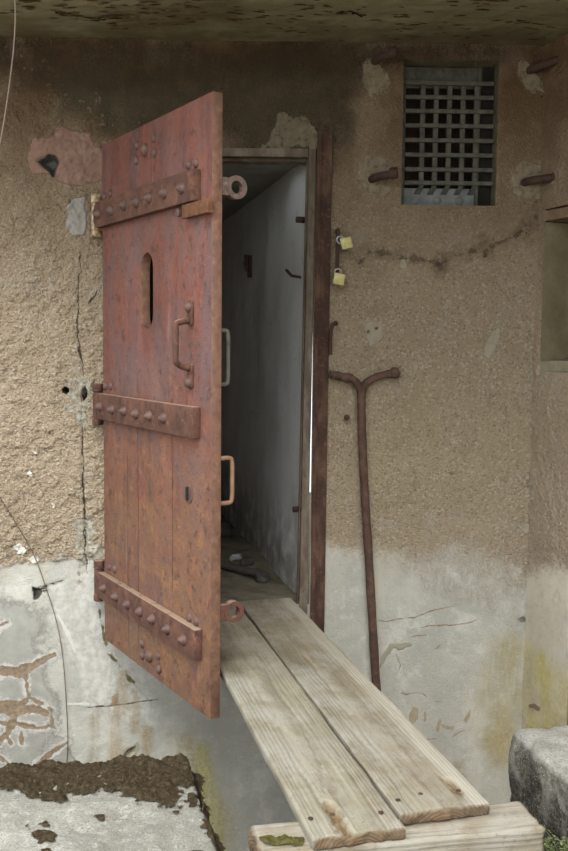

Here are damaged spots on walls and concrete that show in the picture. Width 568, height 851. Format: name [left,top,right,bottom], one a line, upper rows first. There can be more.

corrosion [50,0,208,30]
spalling [261,112,317,149]
crack [32,252,104,600]
crack [379,606,477,649]
peeling [0,599,75,768]